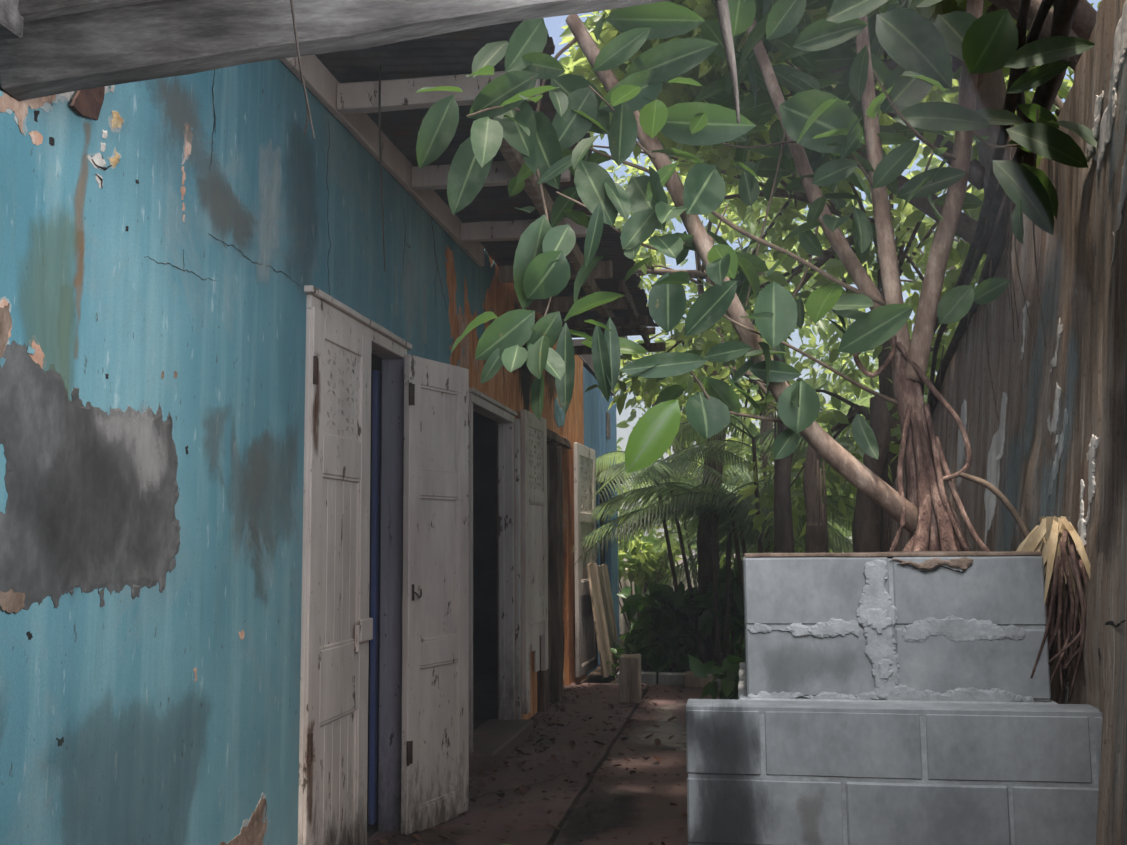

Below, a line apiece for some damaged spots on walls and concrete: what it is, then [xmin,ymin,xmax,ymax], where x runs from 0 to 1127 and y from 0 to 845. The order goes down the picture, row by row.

flaking render [0,90,77,146]
spalling [86,110,125,189]
peeling [1086,0,1127,171]
crack [146,250,216,281]
crack [208,233,300,286]
peeling [0,296,15,367]
peeling [27,335,47,370]
peeling [1047,318,1068,499]
peeling [984,392,1008,545]
peeling [1076,434,1101,555]
flaking render [0,589,25,614]
peeling [219,793,268,845]